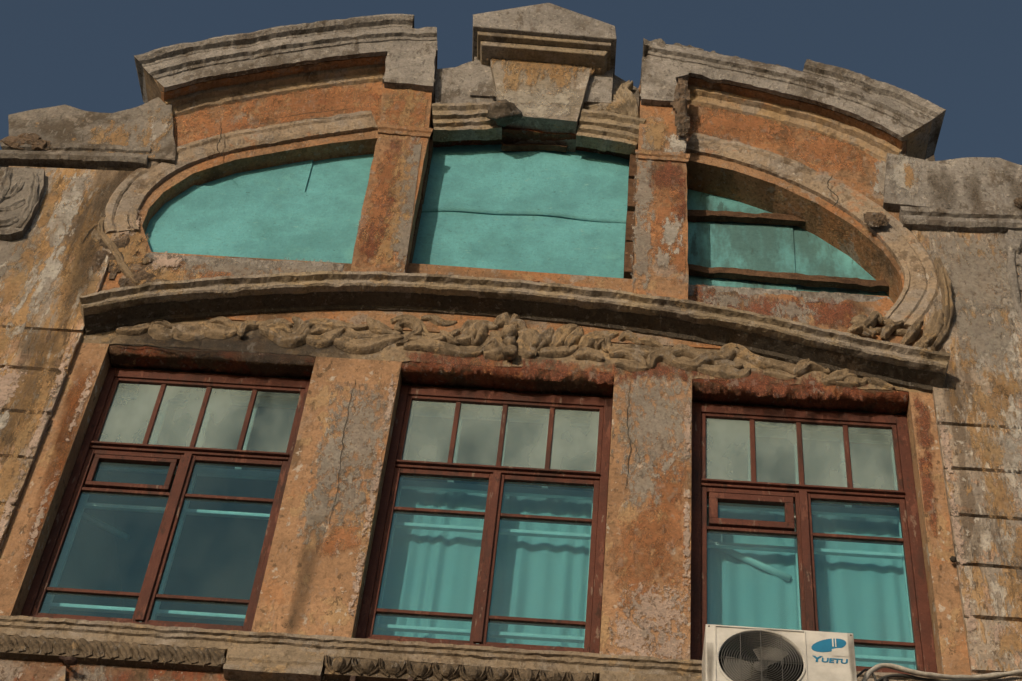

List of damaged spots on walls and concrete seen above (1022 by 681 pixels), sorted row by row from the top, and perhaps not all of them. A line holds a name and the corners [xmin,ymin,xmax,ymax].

peeling [630,78,690,289]
peeling [24,472,60,557]
peeling [0,172,344,540]
crack [329,380,356,523]
peeling [692,284,856,328]
peeling [914,397,977,645]
peeling [953,242,1022,564]